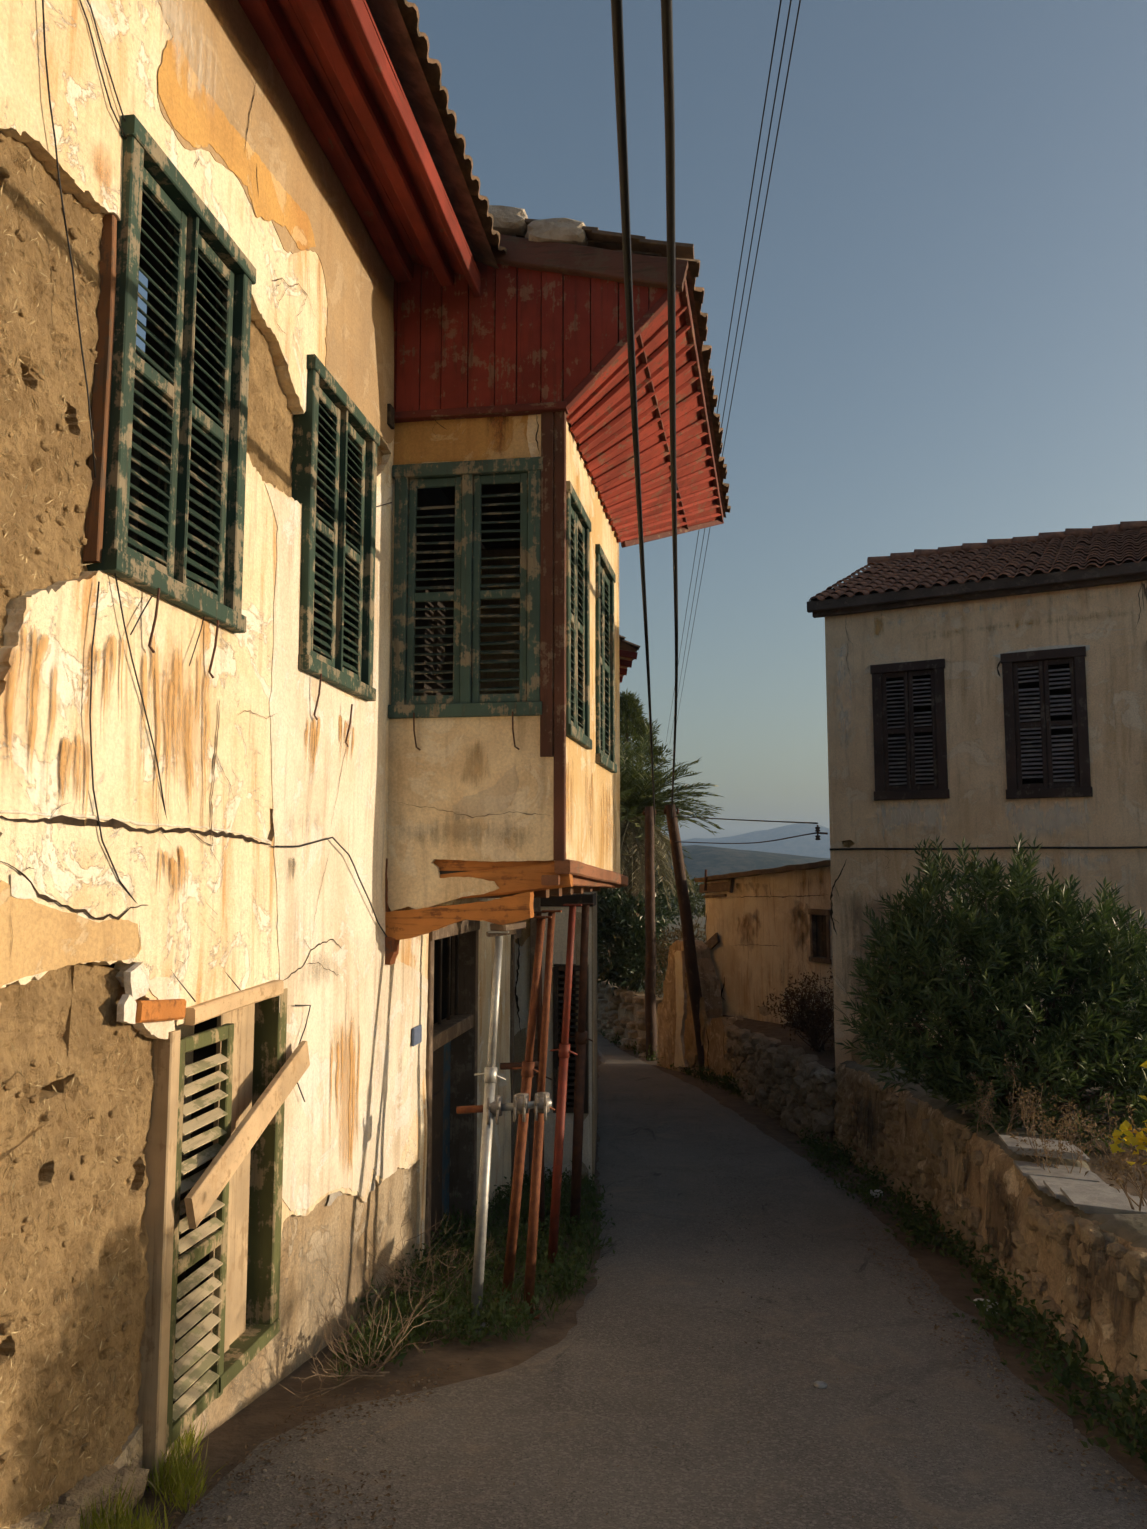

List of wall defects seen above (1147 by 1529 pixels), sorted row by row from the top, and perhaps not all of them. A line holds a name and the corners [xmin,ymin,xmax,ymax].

spalling [0,132,106,648]
peeling [90,0,117,44]
peeling [157,0,541,467]
crack [0,861,141,958]
crack [0,701,275,900]
spalling [0,875,181,1529]